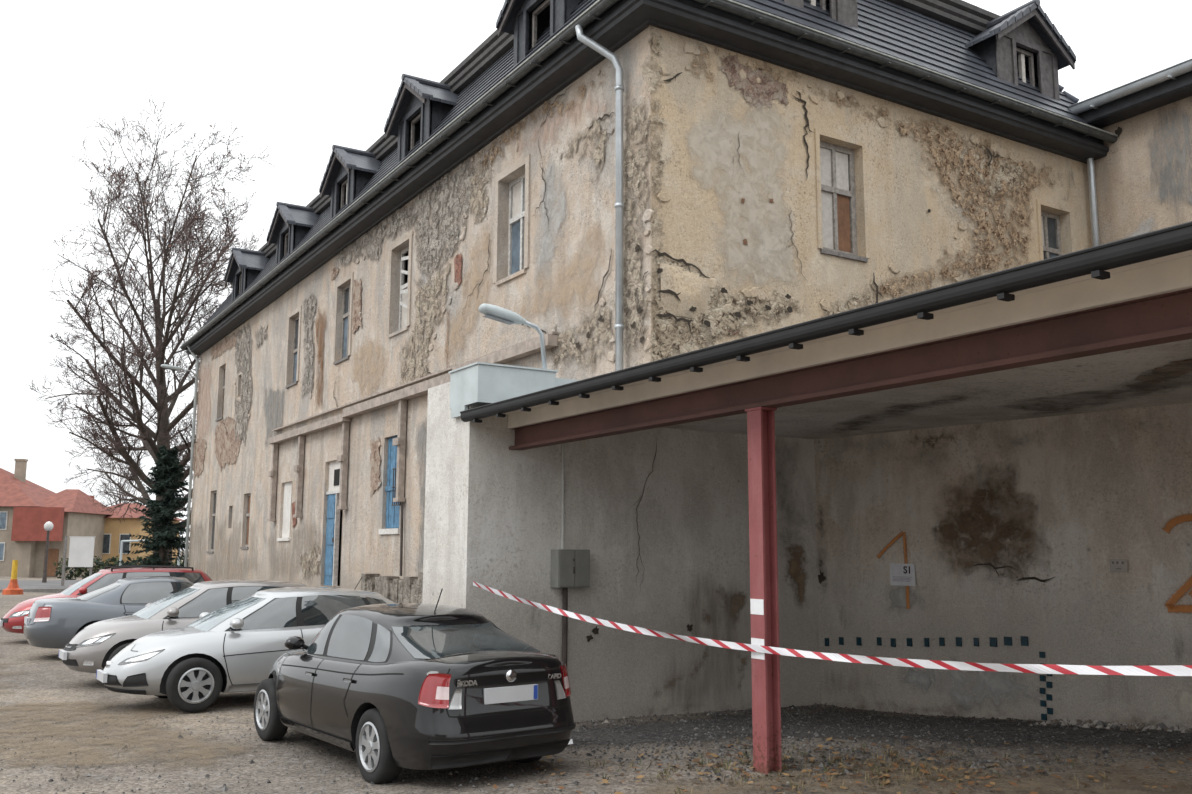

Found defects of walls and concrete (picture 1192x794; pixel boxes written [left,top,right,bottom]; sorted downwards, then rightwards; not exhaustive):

spalling [399,70,602,387]
crack [533,86,571,233]
crack [595,250,612,311]
spalling [549,25,671,370]
crack [626,249,709,332]
peeling [741,287,765,301]
crack [794,91,814,177]
spalling [683,41,1055,298]
spalling [190,324,252,478]
crack [632,443,657,592]
water stain [788,546,806,605]
crack [974,563,1056,582]